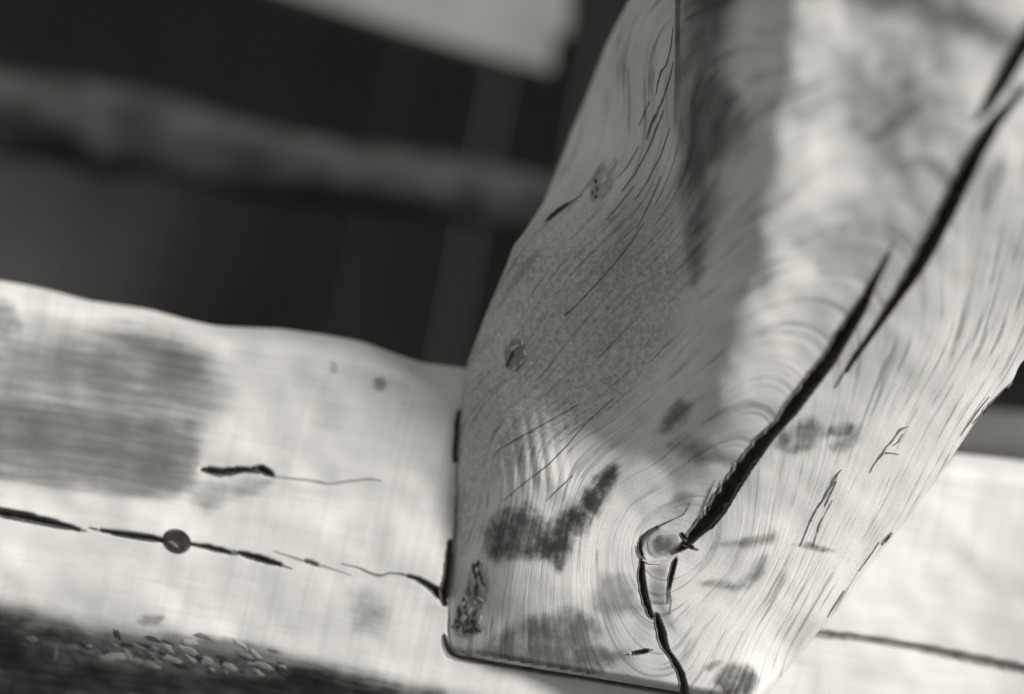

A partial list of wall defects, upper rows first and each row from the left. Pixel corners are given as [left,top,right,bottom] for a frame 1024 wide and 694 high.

crack [625,25,1024,694]
crack [200,465,382,484]
crack [0,509,165,543]
crack [191,543,444,599]